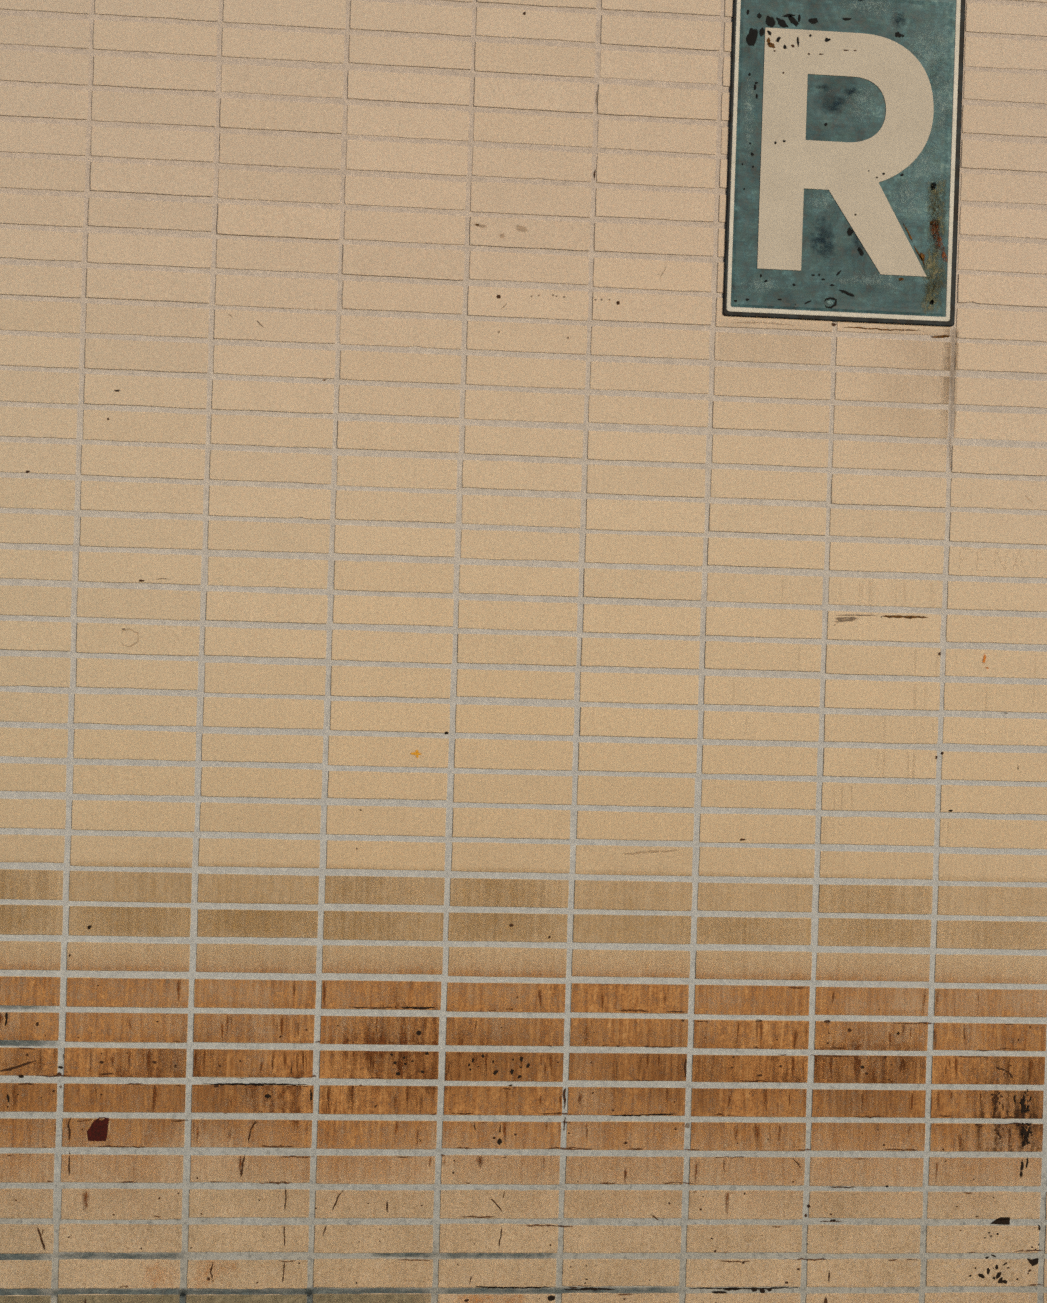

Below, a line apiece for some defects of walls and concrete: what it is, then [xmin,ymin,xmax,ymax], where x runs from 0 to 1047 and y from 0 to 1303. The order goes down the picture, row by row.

leakage [991,1089,1033,1177]